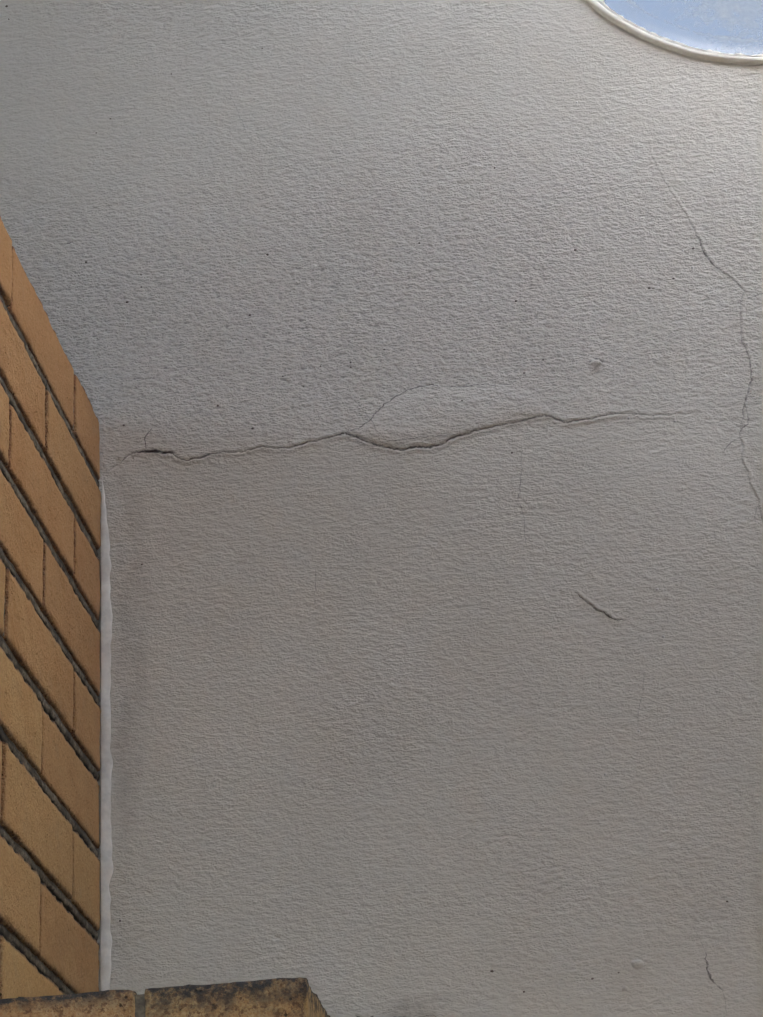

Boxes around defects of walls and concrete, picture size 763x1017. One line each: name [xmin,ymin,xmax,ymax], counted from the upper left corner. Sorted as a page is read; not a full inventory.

crack [100,381,700,479]
crack [575,589,626,621]